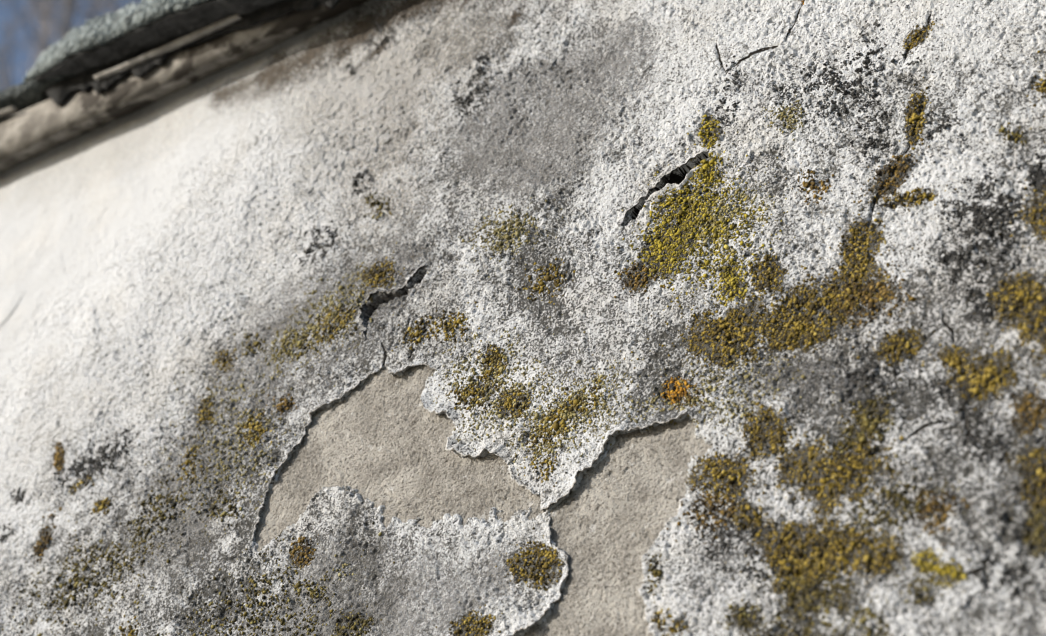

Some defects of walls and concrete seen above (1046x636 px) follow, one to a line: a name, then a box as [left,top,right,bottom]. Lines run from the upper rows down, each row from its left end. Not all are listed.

crack [619,145,709,226]
crack [354,262,428,365]
spalling [248,355,713,636]